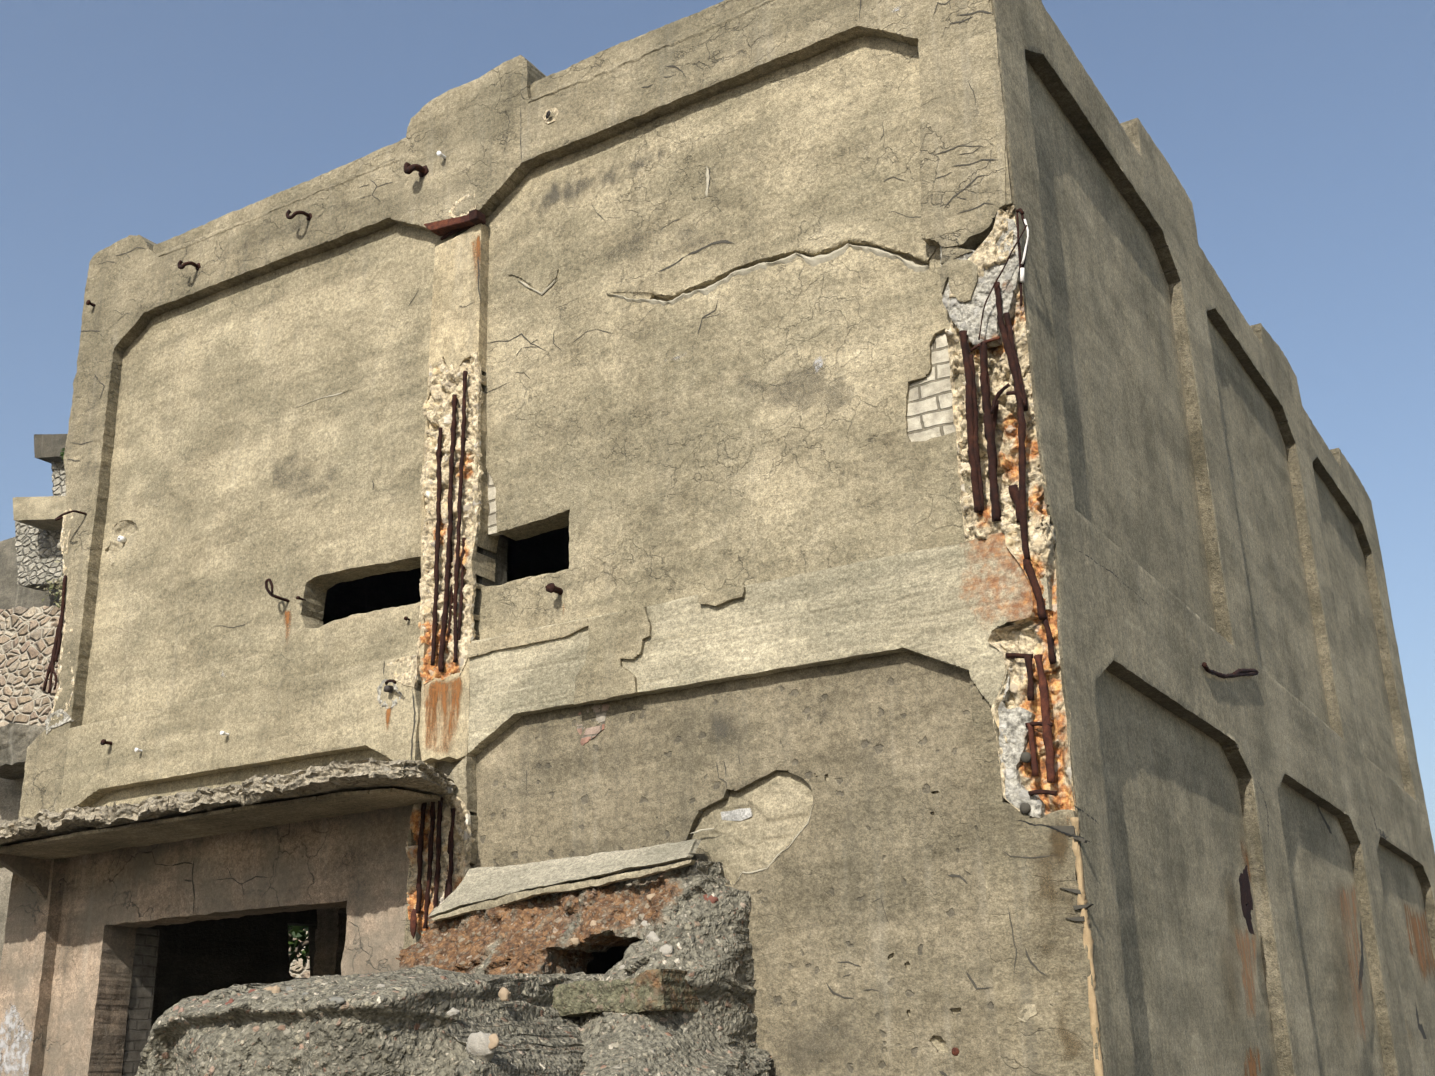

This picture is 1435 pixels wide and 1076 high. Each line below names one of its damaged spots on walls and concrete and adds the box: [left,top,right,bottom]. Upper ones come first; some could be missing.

crack [486,145,998,393]
rust [426,678,461,747]
peeling [377,205,1104,1076]